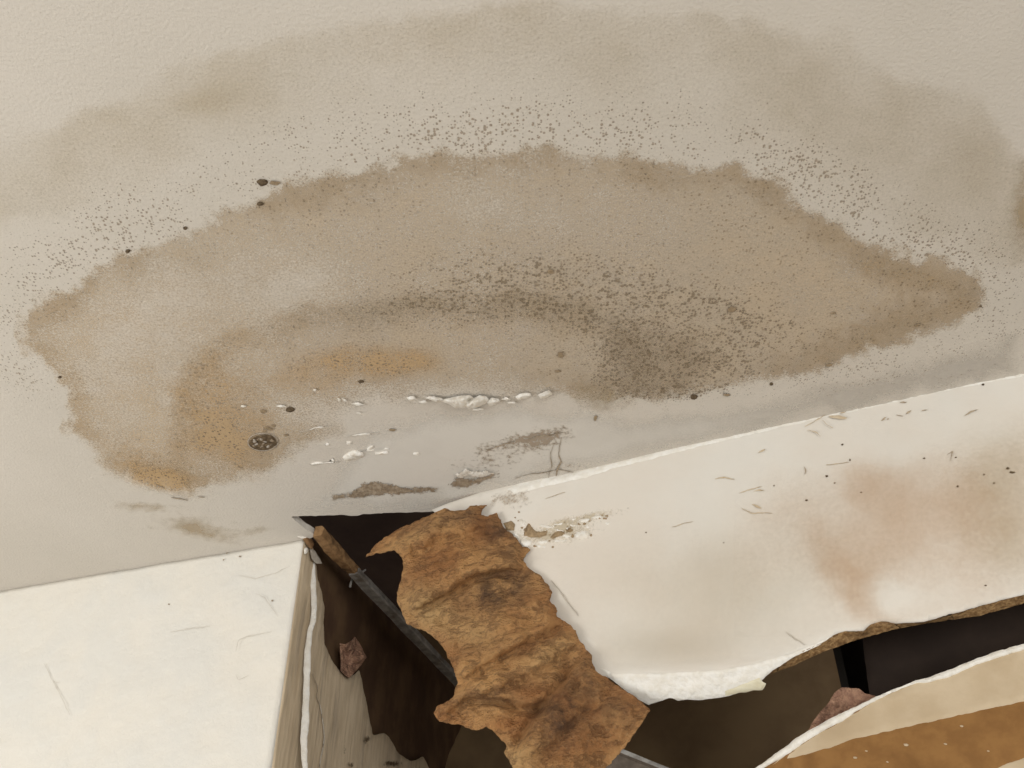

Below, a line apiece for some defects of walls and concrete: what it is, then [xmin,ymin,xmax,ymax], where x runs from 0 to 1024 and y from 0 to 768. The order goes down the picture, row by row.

water stain [28,146,984,488]
flaking render [333,469,499,500]
flaking render [297,536,314,554]
flaking render [503,511,609,548]